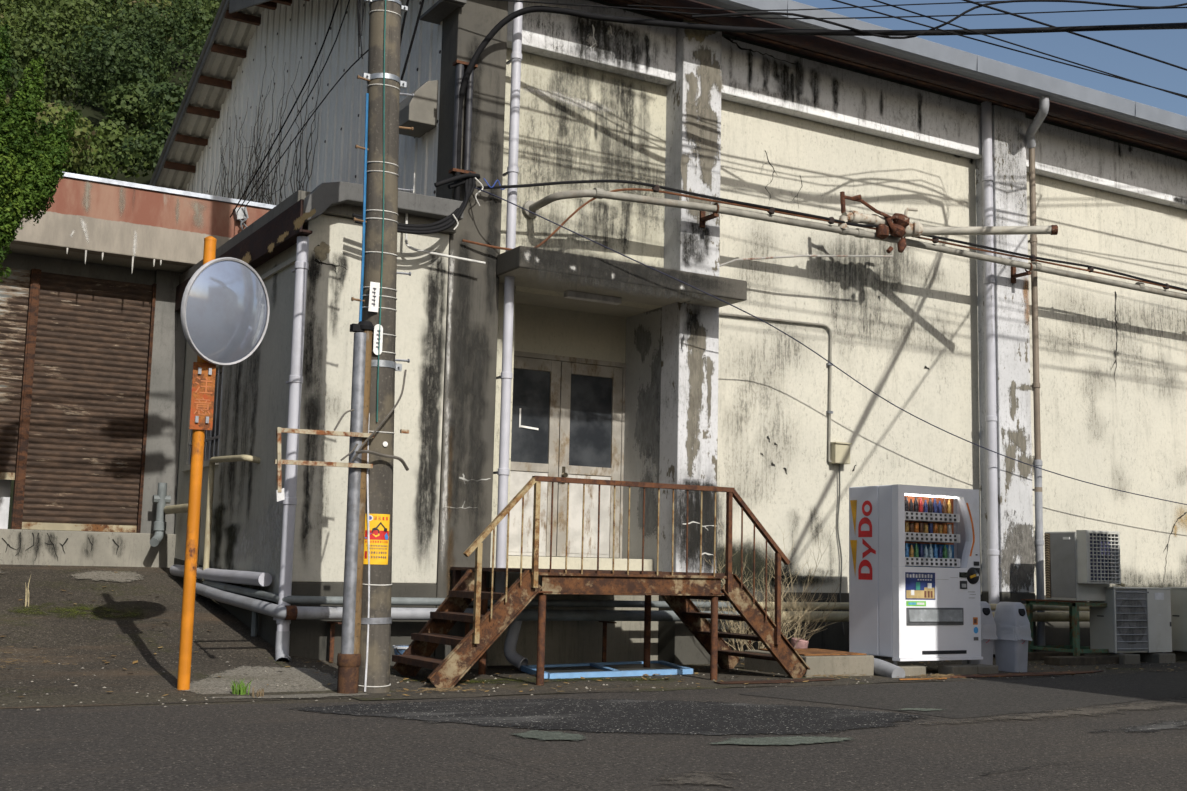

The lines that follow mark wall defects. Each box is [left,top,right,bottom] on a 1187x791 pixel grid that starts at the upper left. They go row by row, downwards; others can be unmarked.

leakage [220,345,260,510]
leakage [302,255,347,548]
leakage [416,242,490,545]
leakage [469,43,501,311]
leakage [524,16,718,300]
peeling [634,307,662,539]
peeling [681,286,715,479]
peeling [679,19,723,231]
leakage [730,48,819,106]
leakage [818,243,908,323]
peeling [1001,380,1035,489]
peeling [993,510,1036,593]